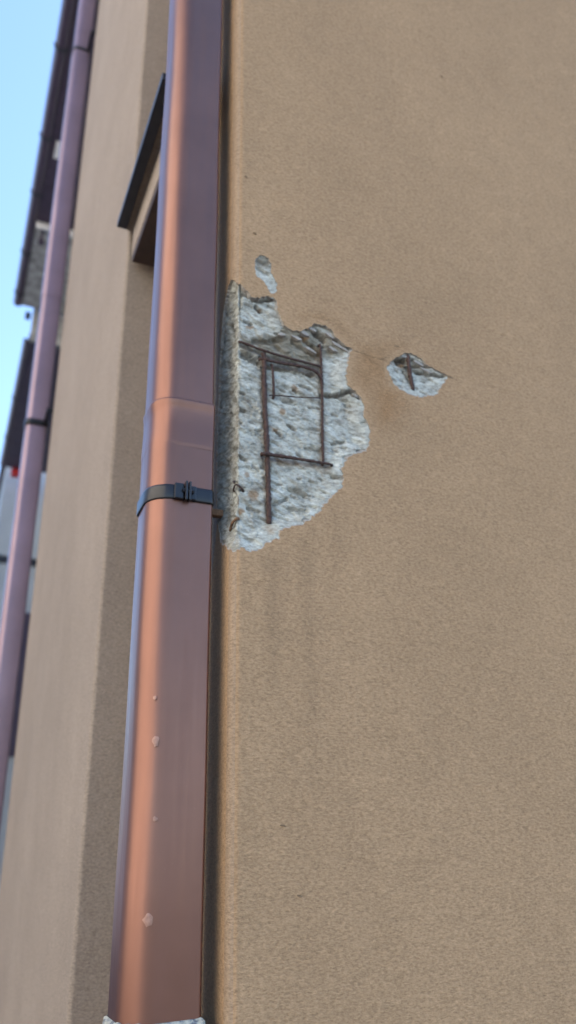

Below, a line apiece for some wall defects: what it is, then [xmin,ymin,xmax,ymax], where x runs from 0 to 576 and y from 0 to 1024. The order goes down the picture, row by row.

spalling [216,255,371,552]
spalling [387,353,448,398]